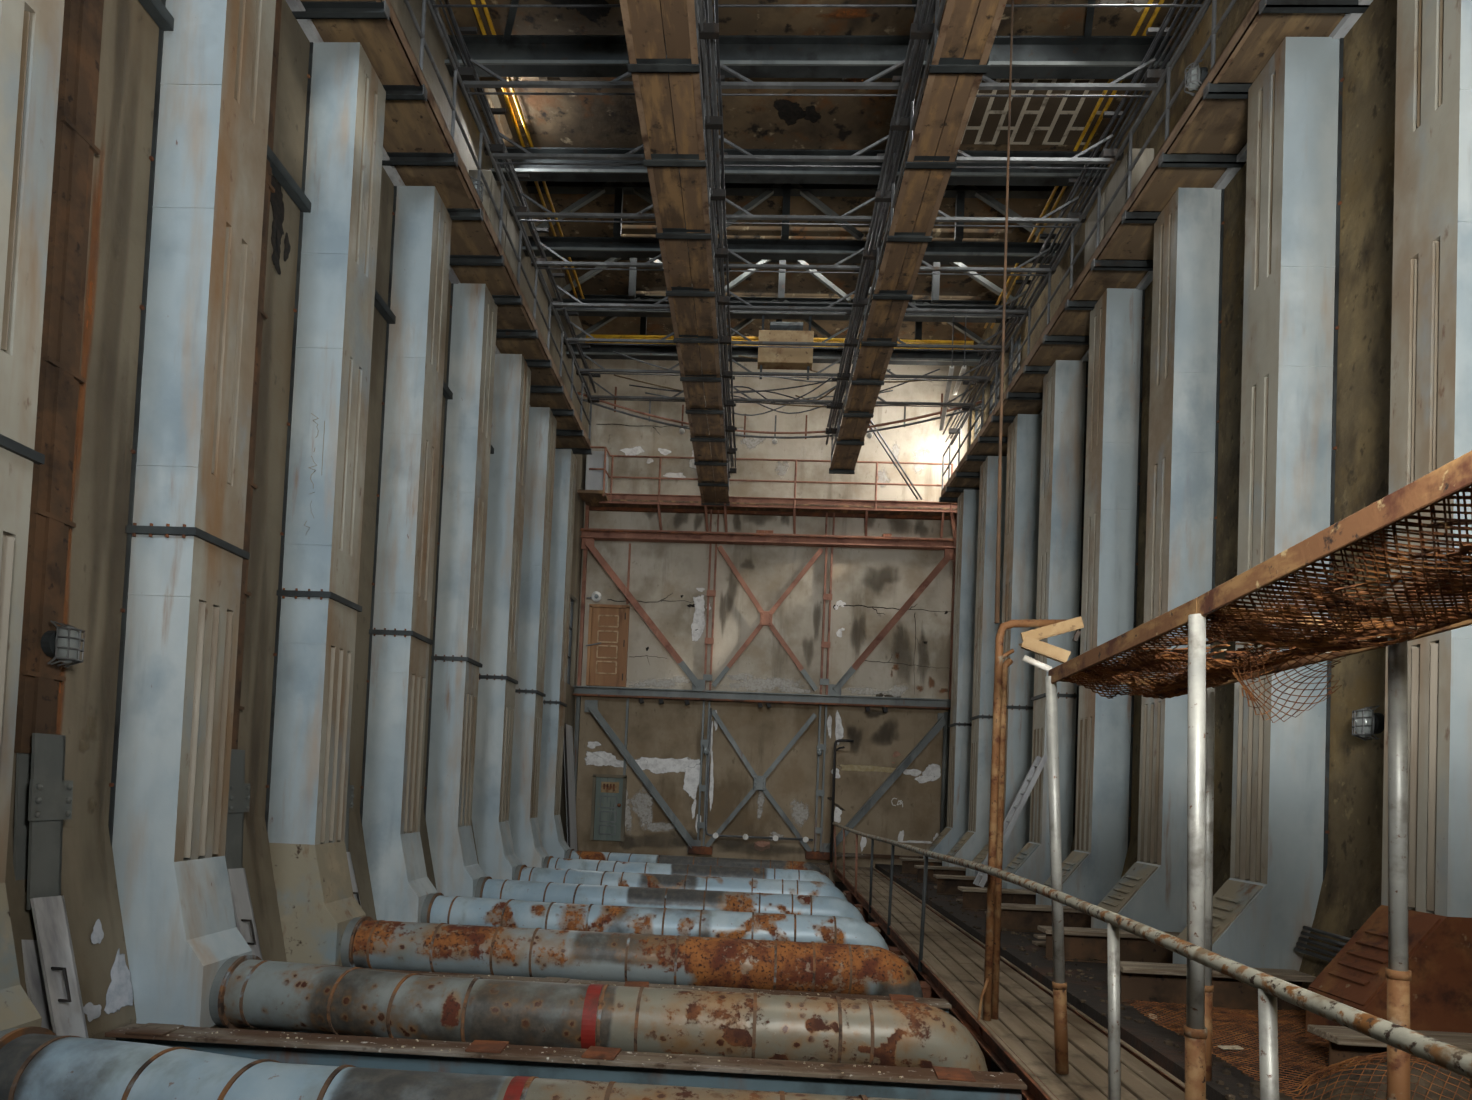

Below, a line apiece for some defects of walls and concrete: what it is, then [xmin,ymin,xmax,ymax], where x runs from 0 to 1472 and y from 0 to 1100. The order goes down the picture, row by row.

leakage [866,570,892,590]
peeling [682,588,711,641]
leakage [804,609,820,658]
leakage [852,622,864,647]
leakage [848,634,928,749]
peeling [827,710,844,745]
peeling [584,710,718,832]
peeling [831,764,941,783]
peeling [827,797,845,823]
peeling [91,919,104,944]
peeling [83,949,133,1022]